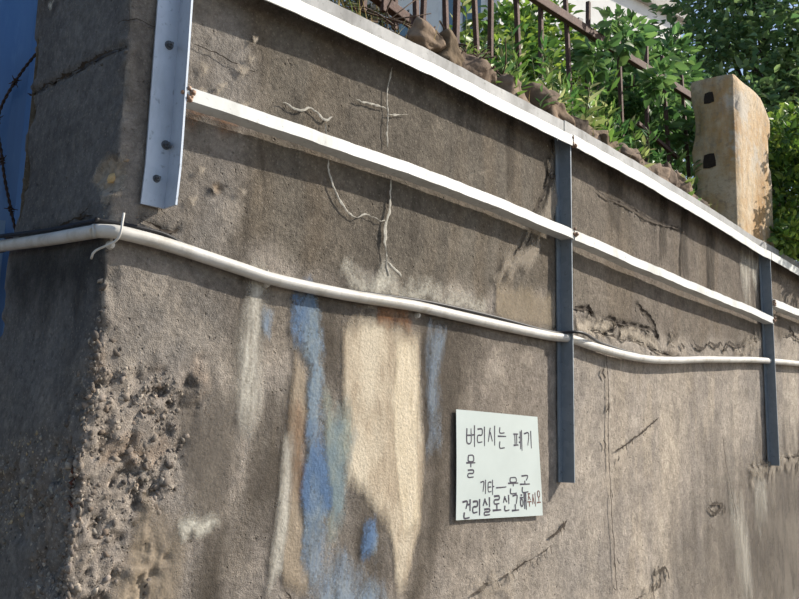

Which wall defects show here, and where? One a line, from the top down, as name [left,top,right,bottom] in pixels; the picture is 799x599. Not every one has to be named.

crack [28,46,128,96]
crack [282,102,332,134]
crack [357,67,408,147]
crack [327,156,402,277]
spalling [500,228,540,279]
spalling [542,188,557,219]
spalling [18,304,214,599]
leakage [424,343,460,547]
crack [575,303,759,590]
leakage [757,436,799,599]
crack [471,520,567,599]
crack [637,566,669,599]